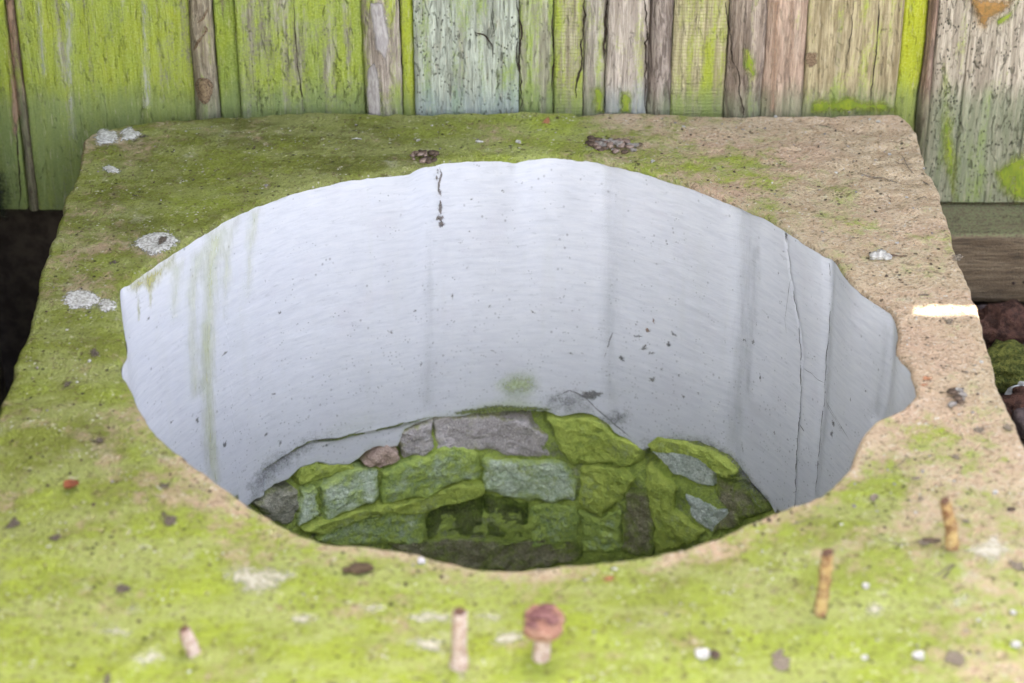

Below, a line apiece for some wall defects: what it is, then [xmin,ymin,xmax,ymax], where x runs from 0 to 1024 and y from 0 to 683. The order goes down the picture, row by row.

crack [784,231,847,525]